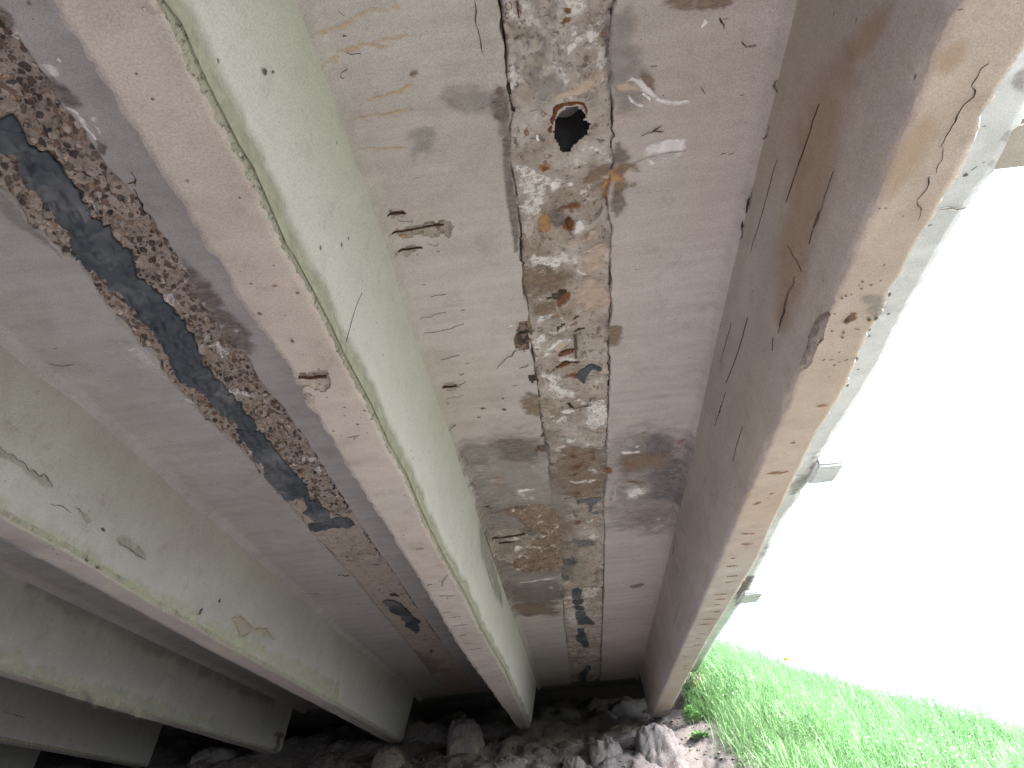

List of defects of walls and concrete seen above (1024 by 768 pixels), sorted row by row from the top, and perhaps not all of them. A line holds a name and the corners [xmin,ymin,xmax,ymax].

crack [474,0,515,116]
rust [530,203,580,233]
rust [584,144,639,218]
efflorescence [634,139,686,165]
crack [917,63,989,221]
spalling [293,368,331,408]
spalling [497,319,533,369]
rust [520,392,541,416]
crack [566,267,612,478]
spalling [799,311,845,371]
spalling [487,503,597,586]
damp [461,432,694,624]